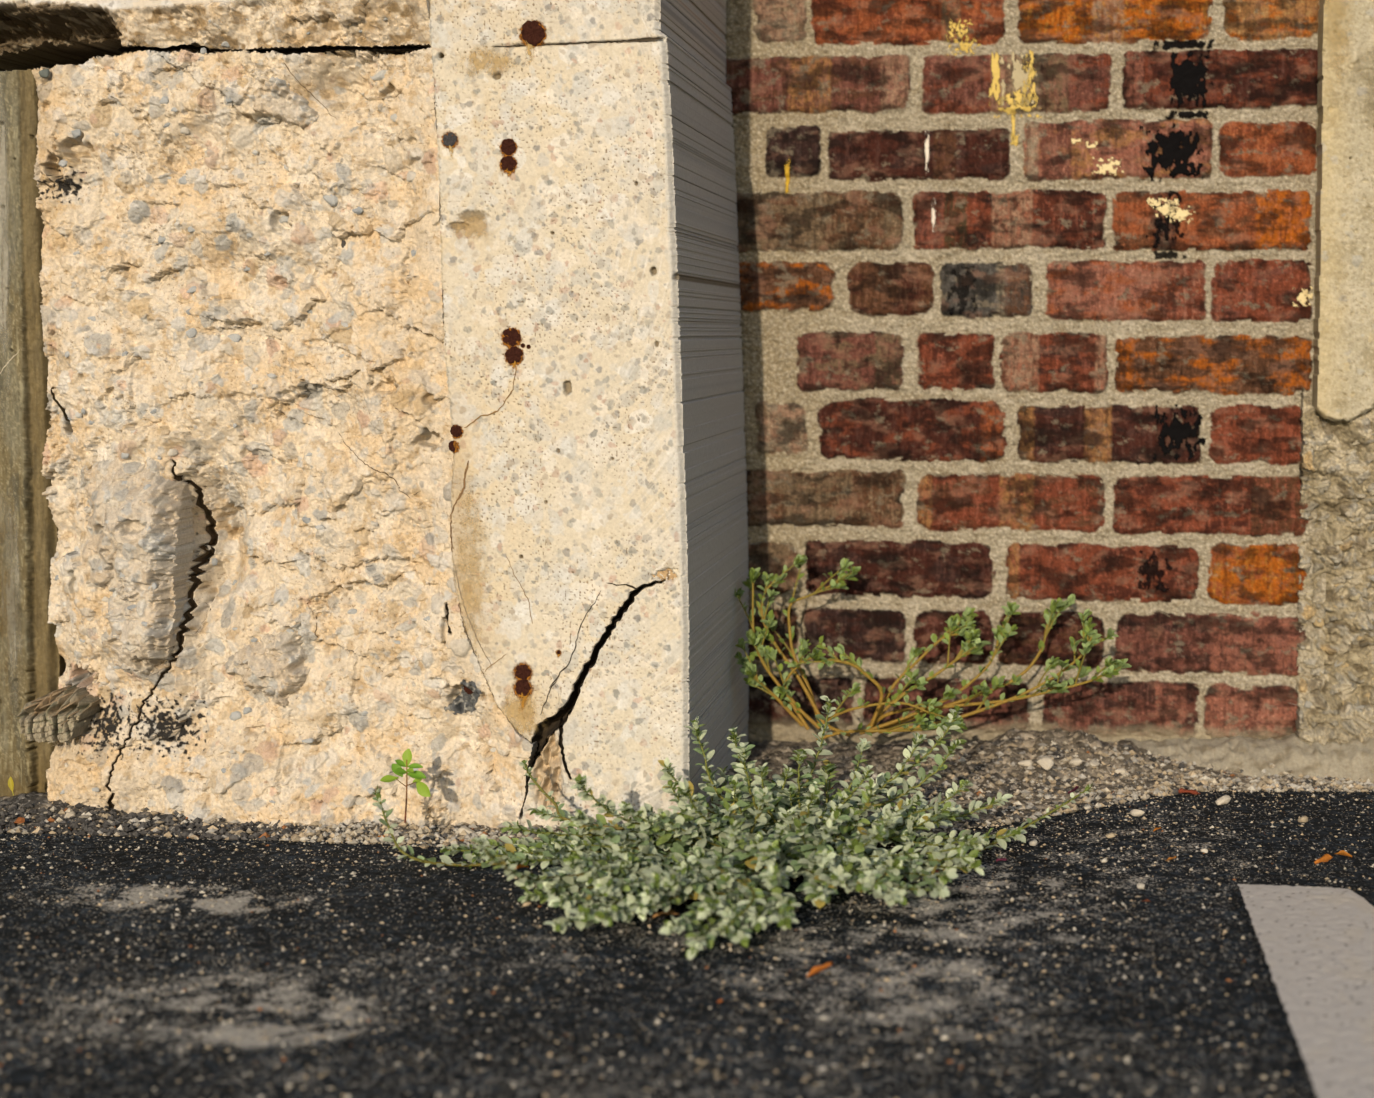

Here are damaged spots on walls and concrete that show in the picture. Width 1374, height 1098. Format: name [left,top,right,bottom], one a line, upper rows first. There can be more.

corrosion [519,20,547,56]
crack [118,44,427,118]
corrosion [499,138,518,176]
corrosion [501,328,531,369]
corrosion [448,424,463,472]
spalling [1290,388,1374,745]
crack [105,460,218,808]
corrosion [513,663,533,708]
crack [519,579,665,817]